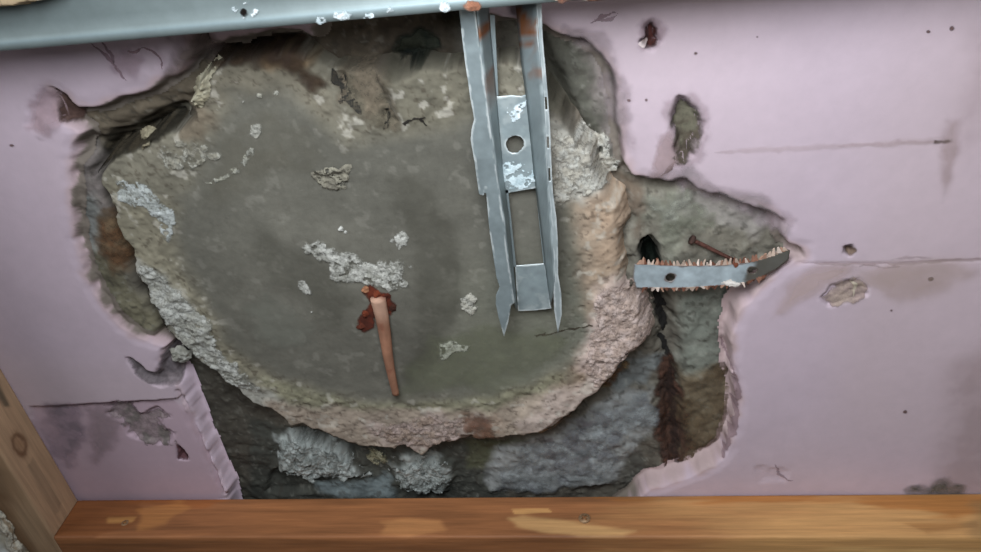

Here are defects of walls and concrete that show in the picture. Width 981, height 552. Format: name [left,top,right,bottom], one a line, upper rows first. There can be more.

spalling [338,53,401,130]
peeling [311,164,352,191]
spalling [655,99,701,179]
rust [356,285,396,332]
rust [654,353,698,466]